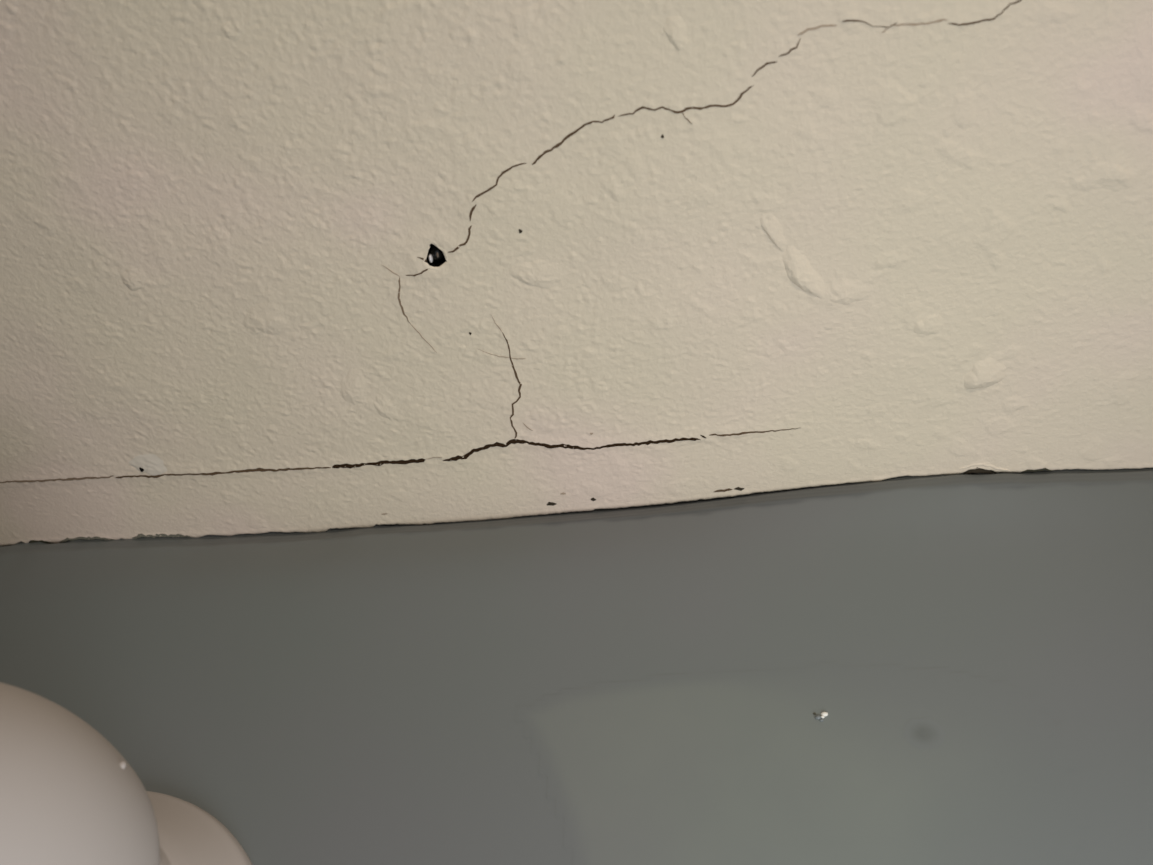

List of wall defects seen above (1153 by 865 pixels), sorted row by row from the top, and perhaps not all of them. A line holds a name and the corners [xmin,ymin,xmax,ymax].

crack [382,0,1021,353]
crack [0,317,798,483]